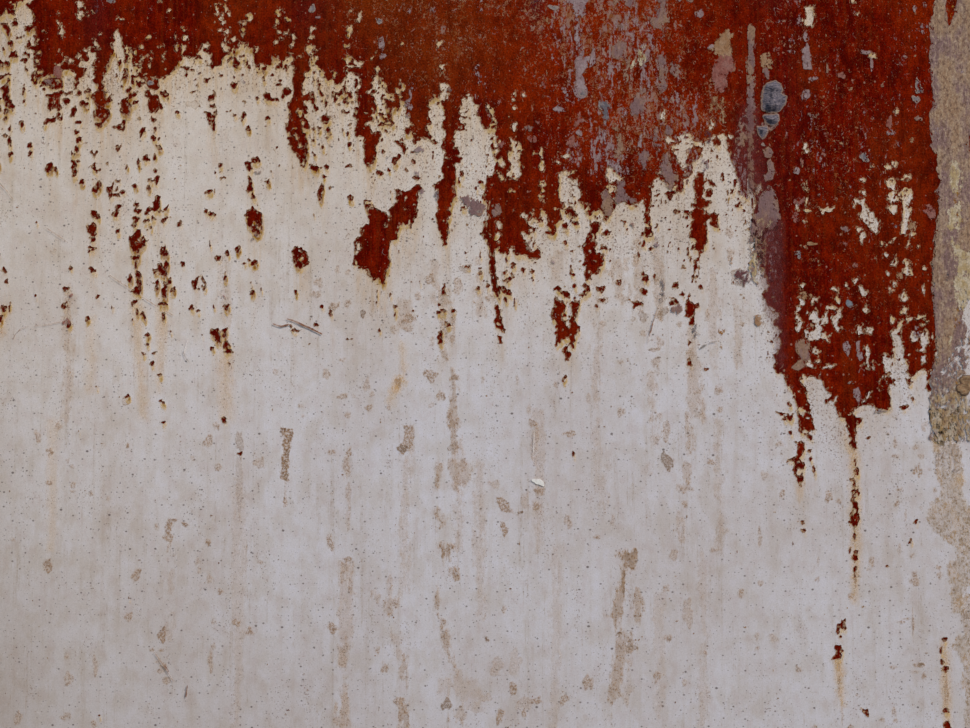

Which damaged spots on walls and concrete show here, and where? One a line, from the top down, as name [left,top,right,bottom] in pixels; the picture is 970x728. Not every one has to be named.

peeling [644,0,704,40]
peeling [599,30,682,108]
peeling [637,125,690,190]
peeling [707,24,845,302]
peeling [460,195,502,218]
corrosion [0,0,957,587]
peeling [791,339,811,370]
peeling [843,300,863,361]
water stain [913,0,970,728]
corrosion [956,375,970,396]
corrosion [831,607,848,684]
corrosion [939,637,949,695]